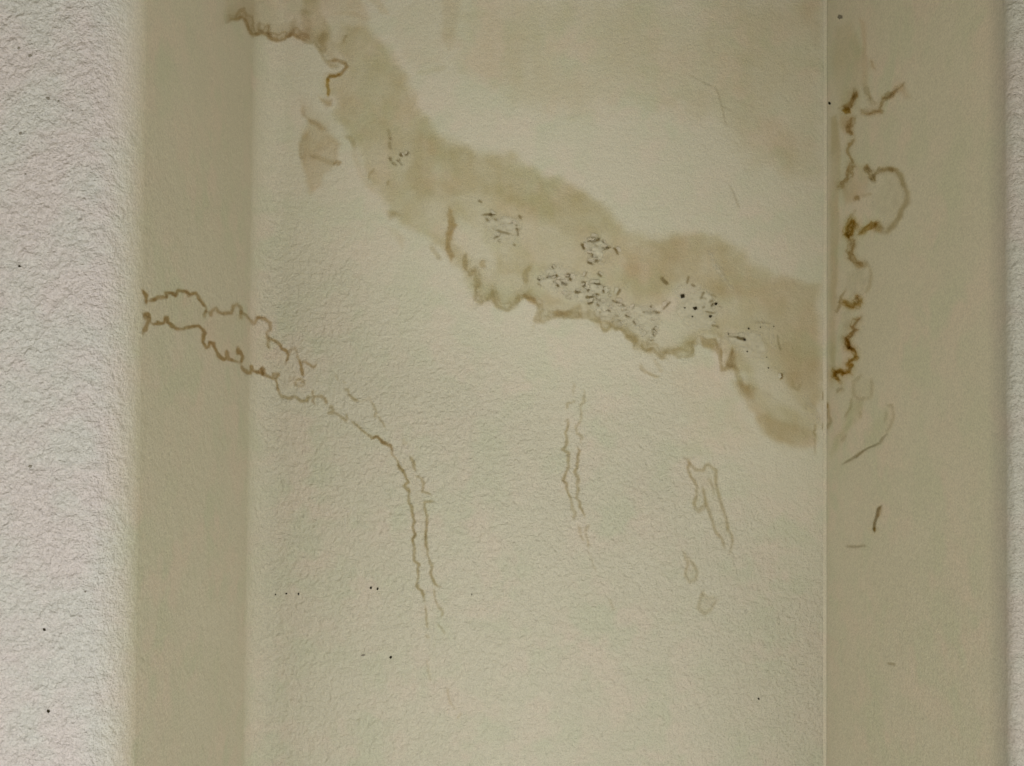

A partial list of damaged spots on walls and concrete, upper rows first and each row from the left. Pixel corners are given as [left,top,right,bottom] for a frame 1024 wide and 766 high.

peeling [538,233,621,303]